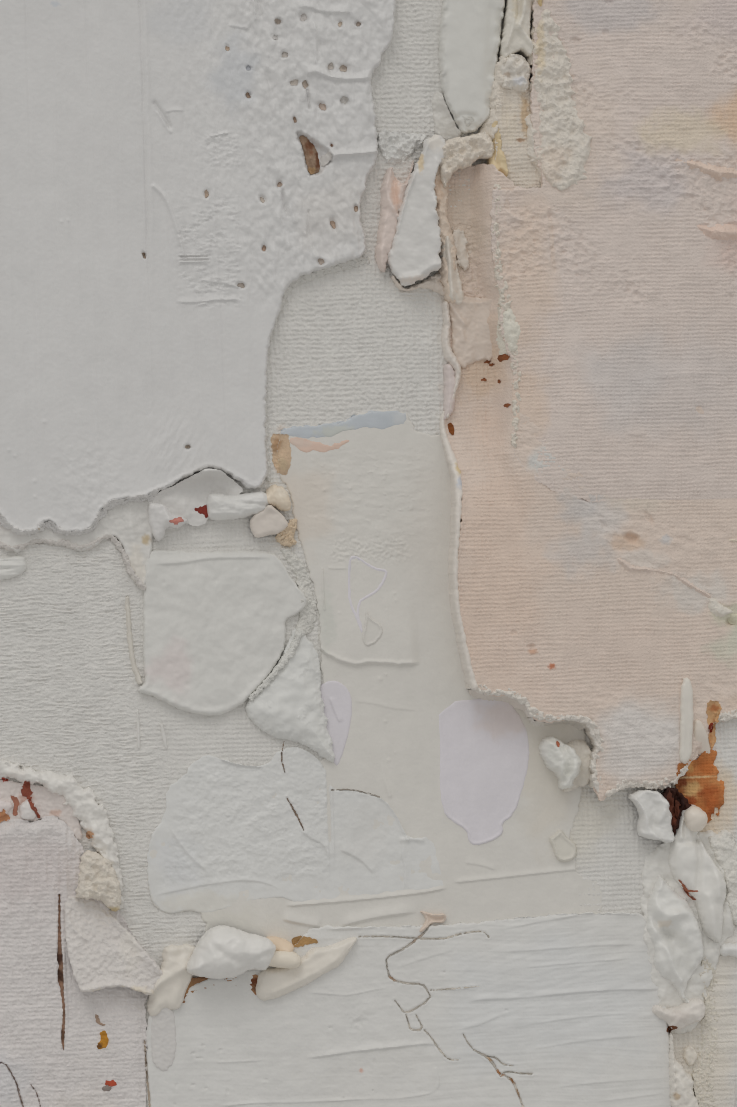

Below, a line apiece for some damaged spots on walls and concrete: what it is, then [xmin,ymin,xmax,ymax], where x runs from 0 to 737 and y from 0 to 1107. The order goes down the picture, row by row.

corrosion [0,781,40,823]
corrosion [675,700,725,823]
crack [359,923,532,1107]